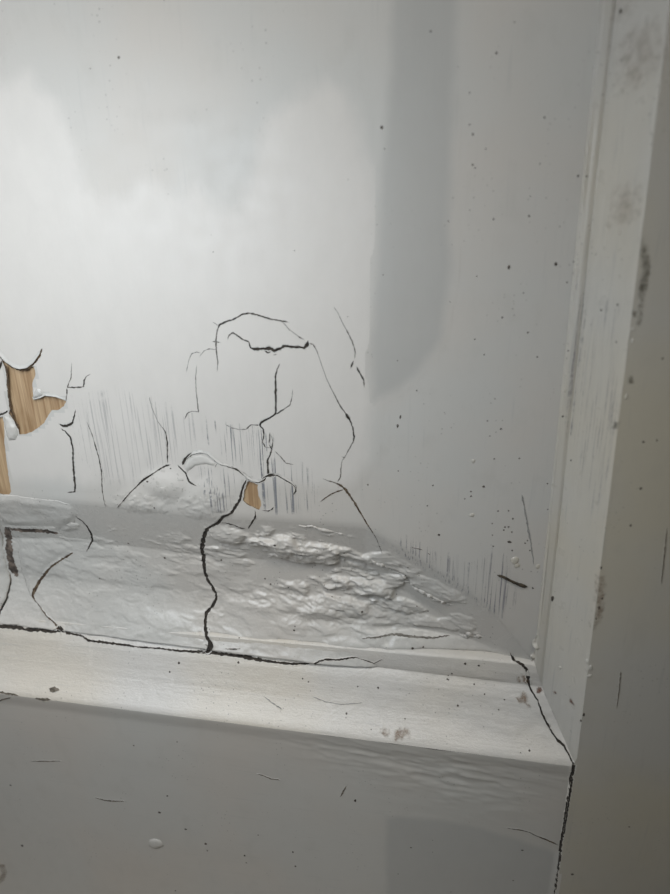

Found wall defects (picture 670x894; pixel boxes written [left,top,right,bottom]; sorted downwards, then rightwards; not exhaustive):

peeling [0,349,78,610]
crack [0,307,450,667]
peeling [187,450,296,510]
crack [506,652,577,894]